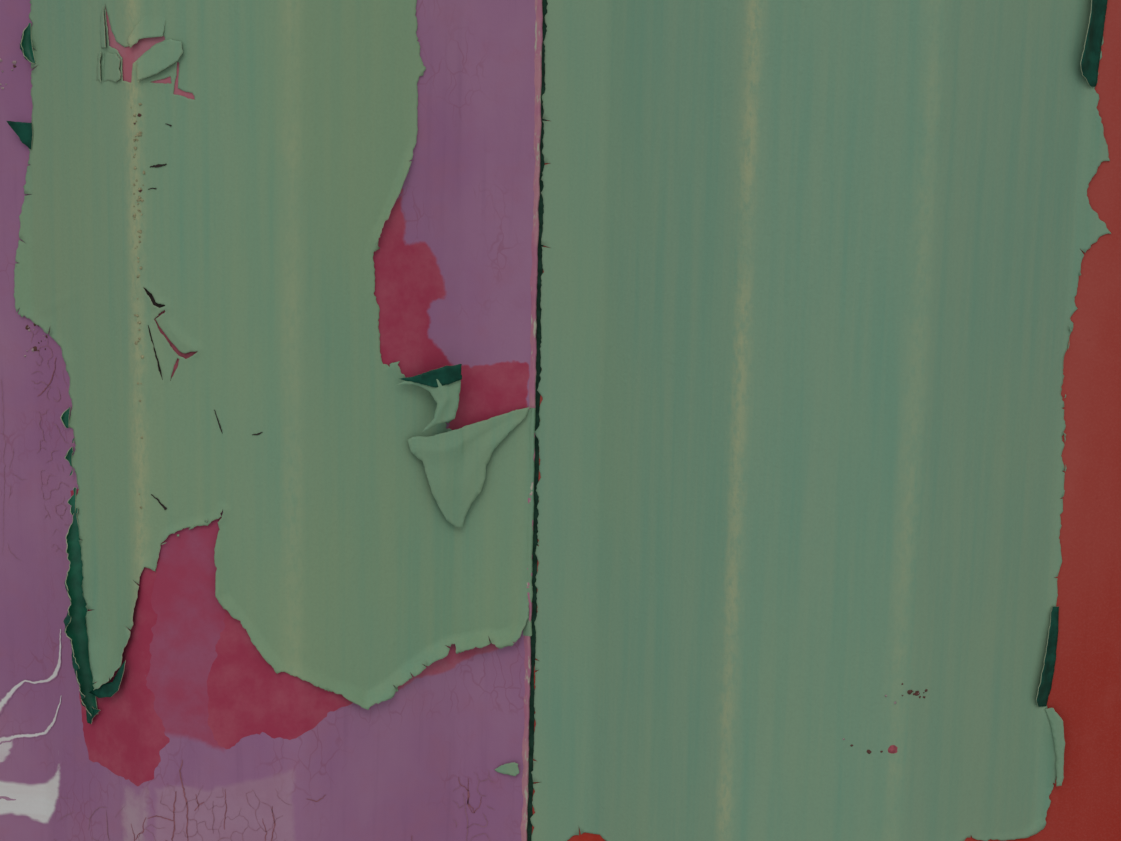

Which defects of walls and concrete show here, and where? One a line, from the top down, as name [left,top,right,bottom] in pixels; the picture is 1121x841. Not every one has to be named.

crack [144,288,198,381]
peeling [7,0,536,724]
peeling [530,0,1111,841]
crack [54,760,325,841]
peeling [114,763,301,841]
peeling [495,762,519,776]